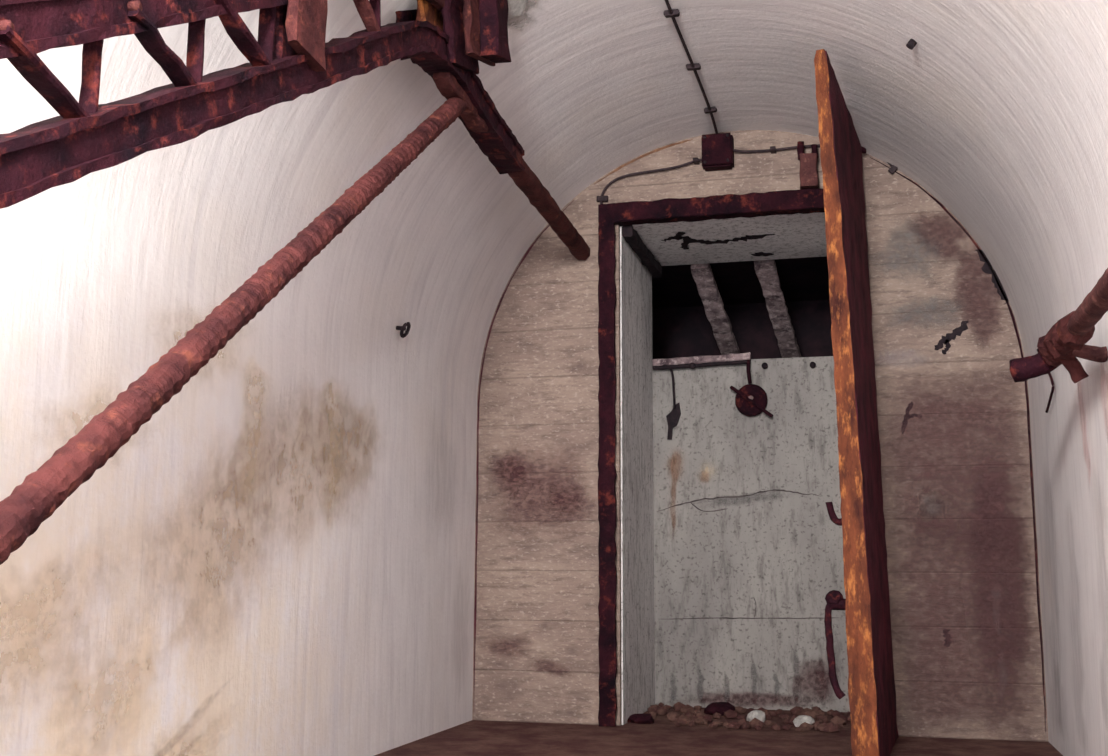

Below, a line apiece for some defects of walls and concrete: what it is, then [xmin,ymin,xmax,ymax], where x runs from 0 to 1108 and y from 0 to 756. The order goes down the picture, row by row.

spalling [508,0,534,27]
crack [661,232,775,257]
damp [895,387,1030,725]